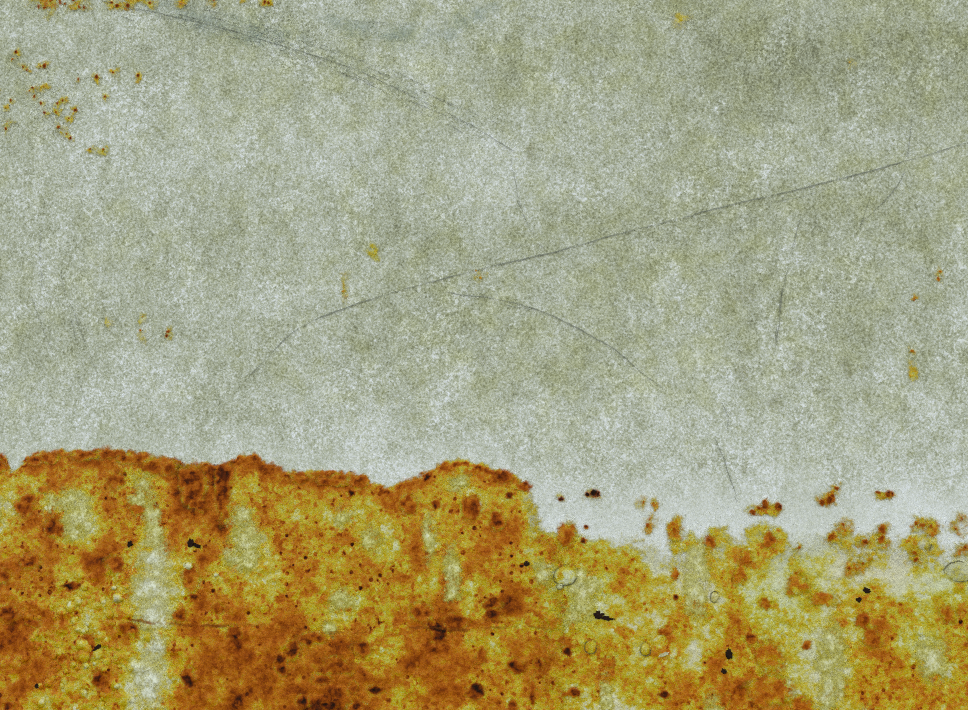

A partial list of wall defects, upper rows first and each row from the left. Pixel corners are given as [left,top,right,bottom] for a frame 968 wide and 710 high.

rust [31,0,86,15]
rust [105,0,159,10]
rust [11,48,49,72]
rust [91,67,120,101]
rust [26,83,77,142]
rust [86,145,108,156]
rust [0,446,968,710]